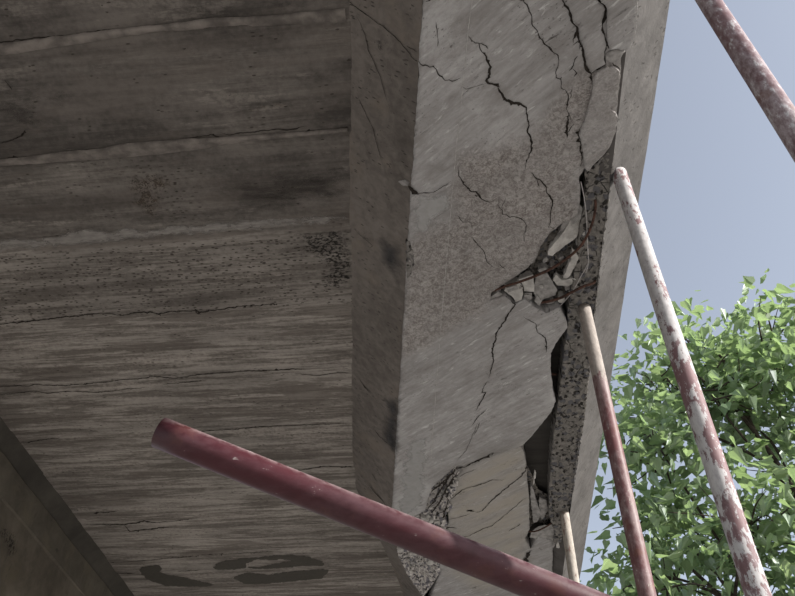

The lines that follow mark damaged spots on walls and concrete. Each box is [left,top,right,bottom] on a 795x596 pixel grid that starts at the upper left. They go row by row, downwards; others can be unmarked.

crack [520,0,619,166]
crack [0,303,282,325]
spalling [490,0,638,562]
crack [446,285,547,537]
spalling [397,547,441,596]
spalling [414,466,461,529]